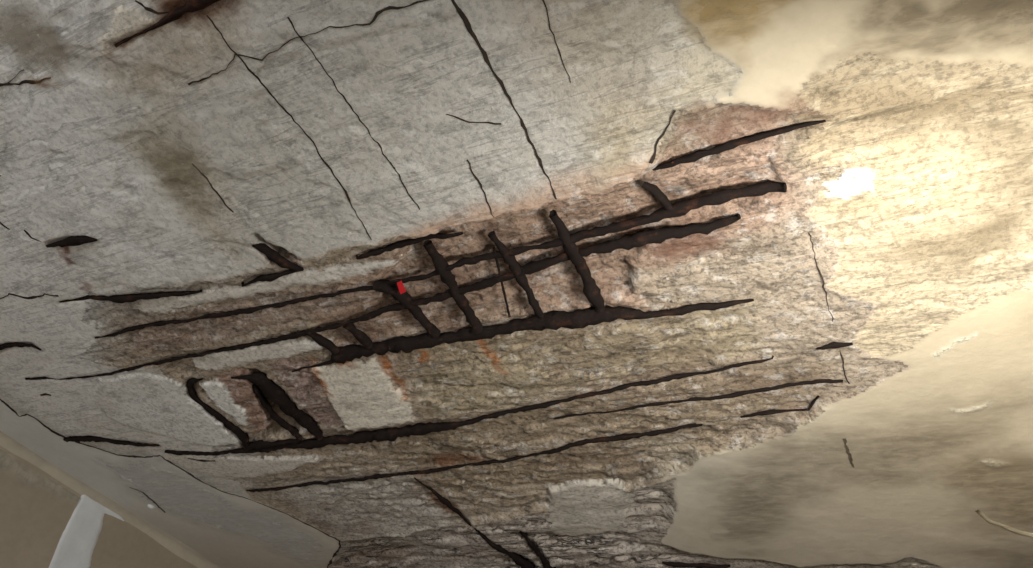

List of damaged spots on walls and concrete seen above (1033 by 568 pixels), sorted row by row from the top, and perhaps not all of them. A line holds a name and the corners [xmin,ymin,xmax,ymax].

crack [188,0,557,240]
spalling [0,0,774,457]
spalling [93,102,940,568]
crack [542,0,571,83]
damp [690,0,784,35]
spalling [653,51,1033,359]
damp [871,0,1033,52]